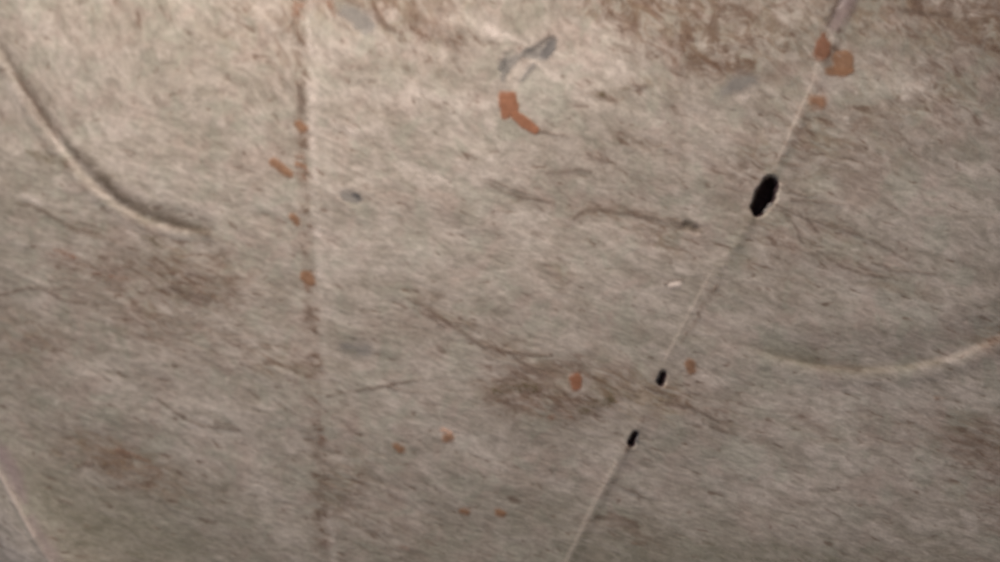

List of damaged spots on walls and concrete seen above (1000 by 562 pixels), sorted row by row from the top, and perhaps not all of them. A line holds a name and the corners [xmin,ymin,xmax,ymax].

corrosion [814,33,853,75]
corrosion [499,92,539,133]
corrosion [270,159,306,177]
corrosion [301,271,314,285]